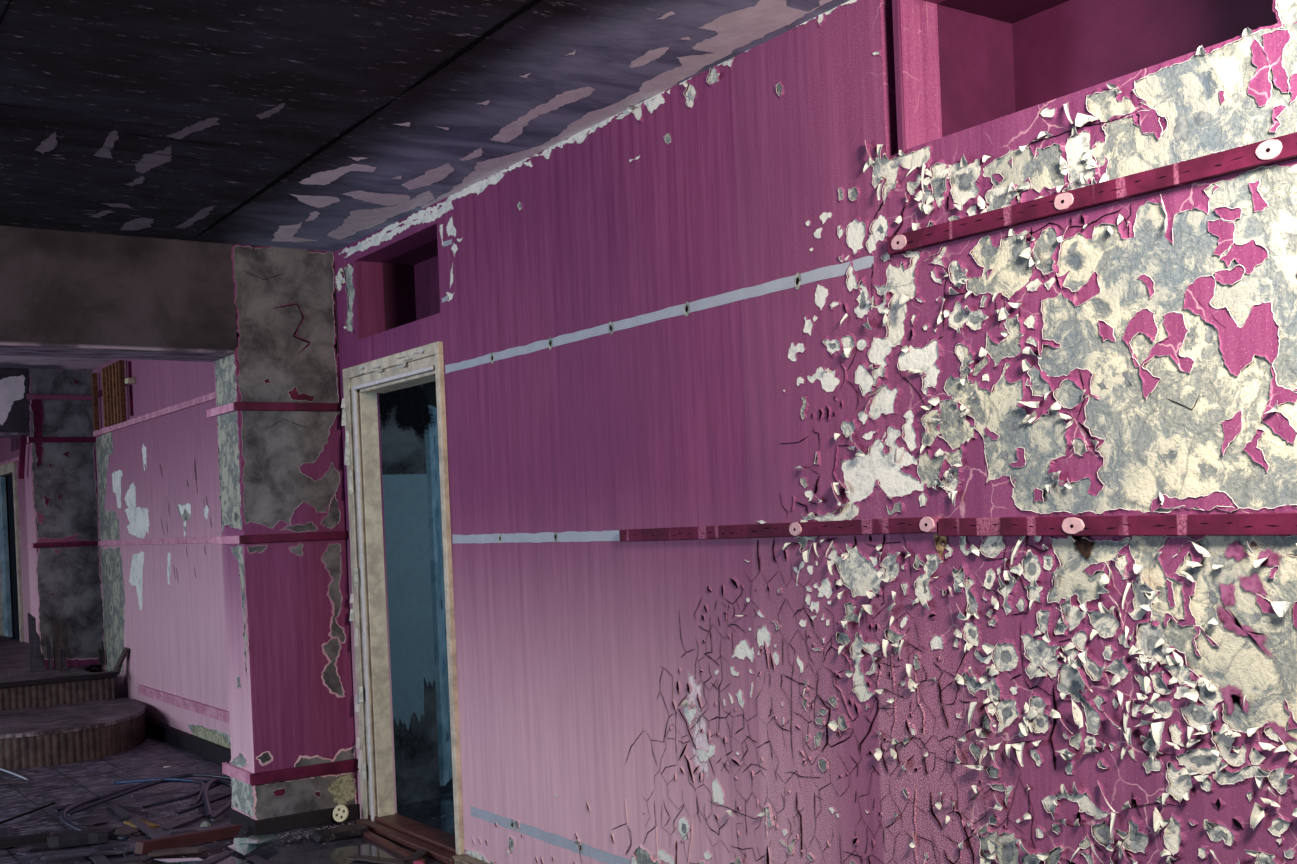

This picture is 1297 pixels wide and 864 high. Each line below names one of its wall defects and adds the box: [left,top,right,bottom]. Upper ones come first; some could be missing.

spalling [177,43,763,712]
peeling [778,0,1297,864]
peeling [715,597,782,710]
crack [472,354,1181,864]
peeling [681,700,698,729]
spalling [187,723,366,820]
peeling [678,816,690,841]
peeling [712,777,734,817]
peeling [757,803,815,862]